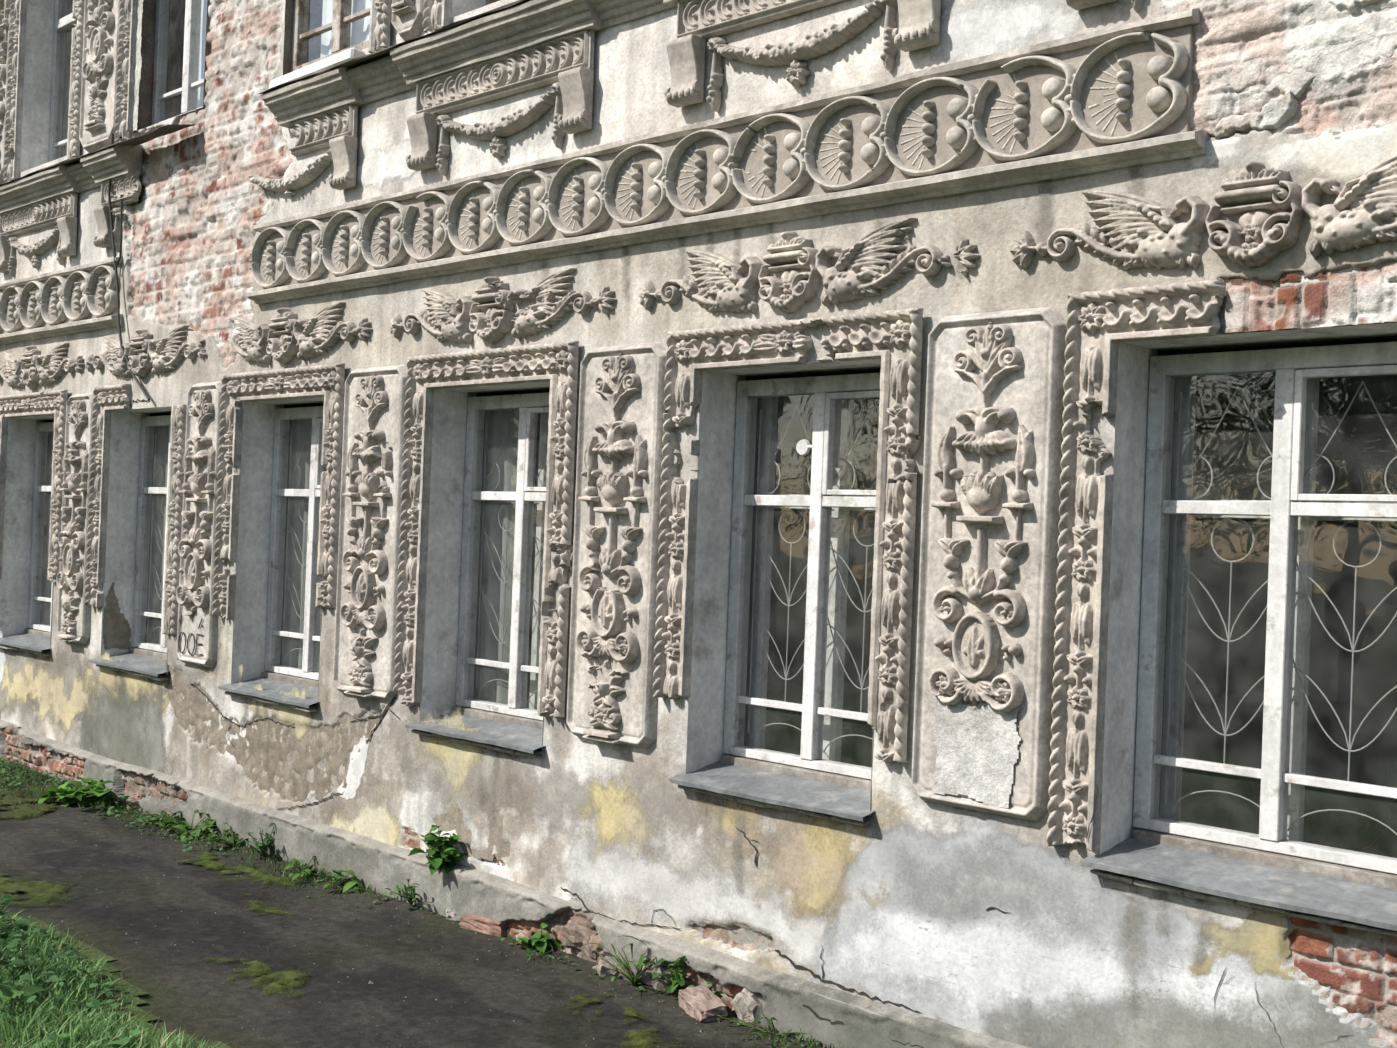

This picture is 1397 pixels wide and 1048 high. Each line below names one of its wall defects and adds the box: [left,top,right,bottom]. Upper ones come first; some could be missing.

spalling [1160,0,1397,140]
spalling [125,0,293,368]
spalling [1218,261,1397,334]
water stain [0,616,221,785]
crack [190,682,295,747]
peeling [165,659,382,803]
crack [277,783,343,810]
crack [350,697,399,742]
water stain [402,716,744,892]
crack [561,887,681,930]
crack [774,945,923,1048]
spalling [1288,917,1397,1048]